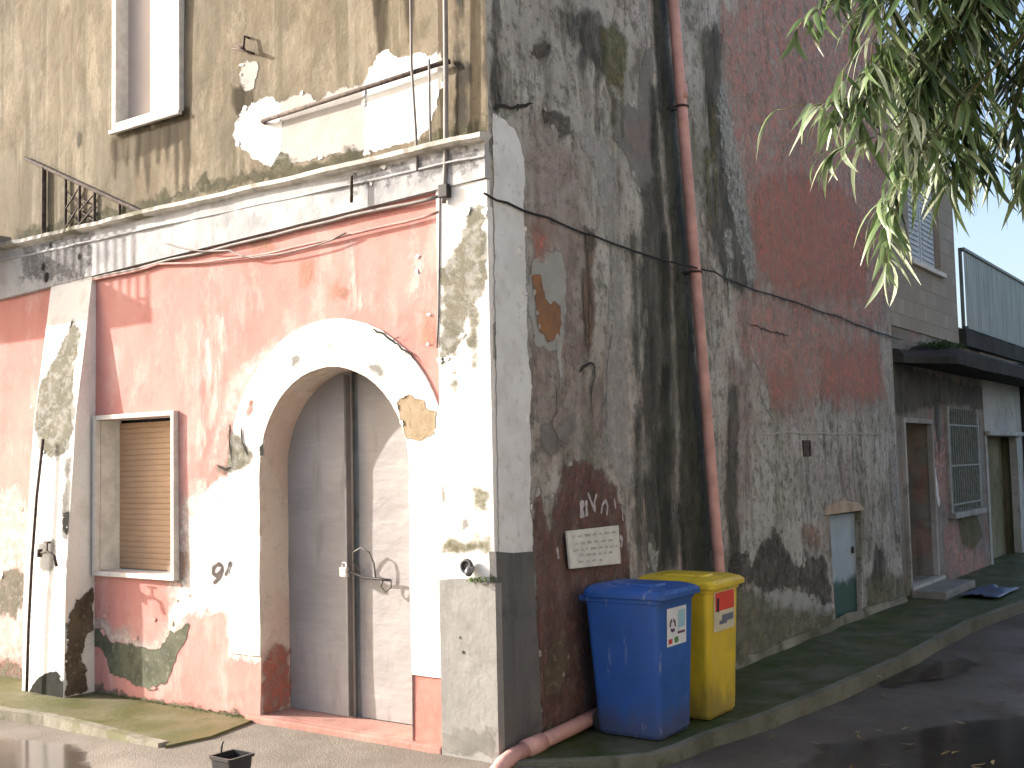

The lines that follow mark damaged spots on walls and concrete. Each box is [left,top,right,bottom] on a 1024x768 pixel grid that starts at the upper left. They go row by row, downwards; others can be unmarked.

peeling [29,317,274,698]
flaking render [232,50,443,167]
spalling [395,394,438,441]
peeling [465,113,567,553]
damp [532,42,551,60]
damp [567,9,606,114]
damp [632,0,714,572]
damp [705,83,759,315]
damp [726,385,833,621]
damp [874,544,886,584]